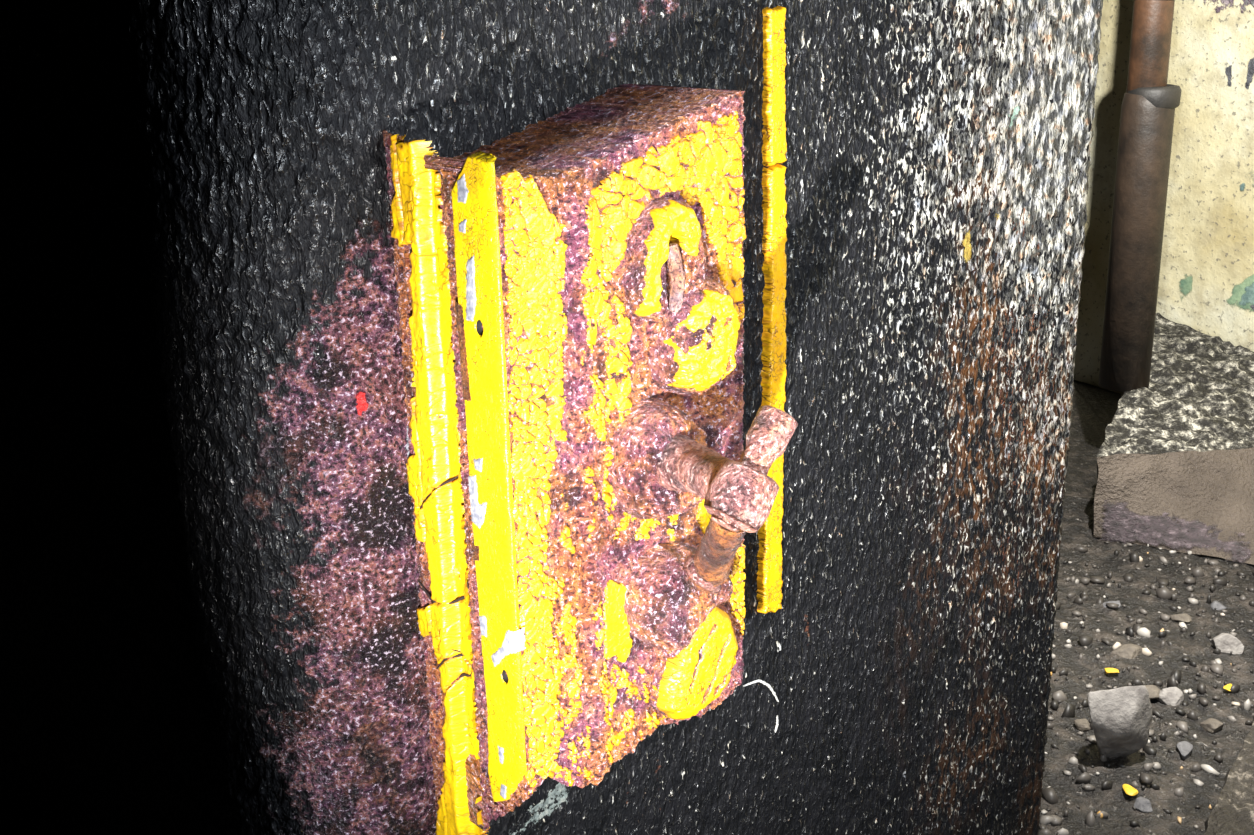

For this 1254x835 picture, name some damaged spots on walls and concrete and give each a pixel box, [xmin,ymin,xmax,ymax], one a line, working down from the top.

spalling [1204,0,1254,13]
corrosion [455,302,471,401]
peeling [581,111,746,541]
corrosion [244,219,437,835]
crack [420,476,458,509]
peeling [390,134,490,835]
crack [417,579,469,604]
crack [436,649,472,679]
peeling [491,169,594,795]
peeling [593,544,746,763]